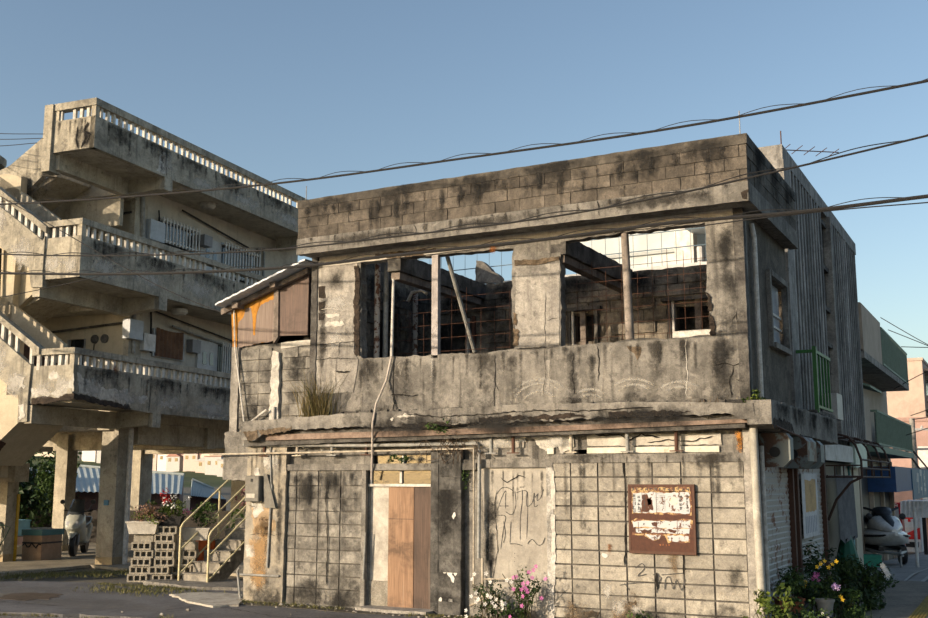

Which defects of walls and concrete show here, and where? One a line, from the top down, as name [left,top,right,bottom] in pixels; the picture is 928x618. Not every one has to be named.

leakage [525,160,573,193]
leakage [617,150,659,178]
leakage [369,185,414,221]
leakage [608,193,706,208]
leakage [719,231,734,288]
peeling [13,370,148,420]
leakage [712,339,729,400]
crack [715,363,739,398]
peeling [254,449,277,476]
peeling [493,435,569,454]
leakage [294,473,356,528]
peeling [245,502,276,570]